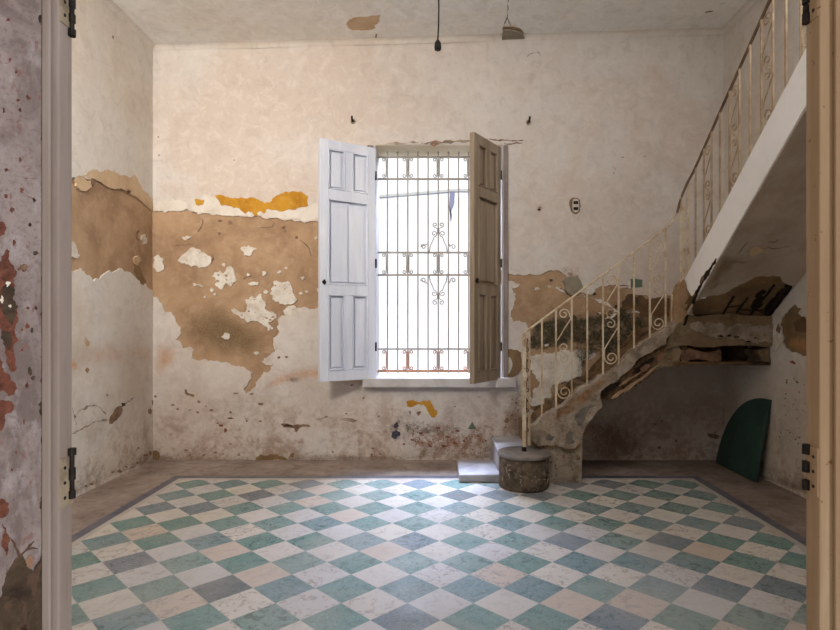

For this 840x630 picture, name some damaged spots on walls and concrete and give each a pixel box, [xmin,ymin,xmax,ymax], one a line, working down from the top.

peeling [346,15,380,38]
spalling [0,240,42,431]
spalling [72,169,318,395]
spalling [508,270,670,411]
spalling [677,259,806,364]
crack [72,405,107,434]
spalling [109,403,126,424]
spalling [281,423,310,432]
spalling [389,398,519,459]
spalling [0,498,10,555]
spalling [0,555,42,630]